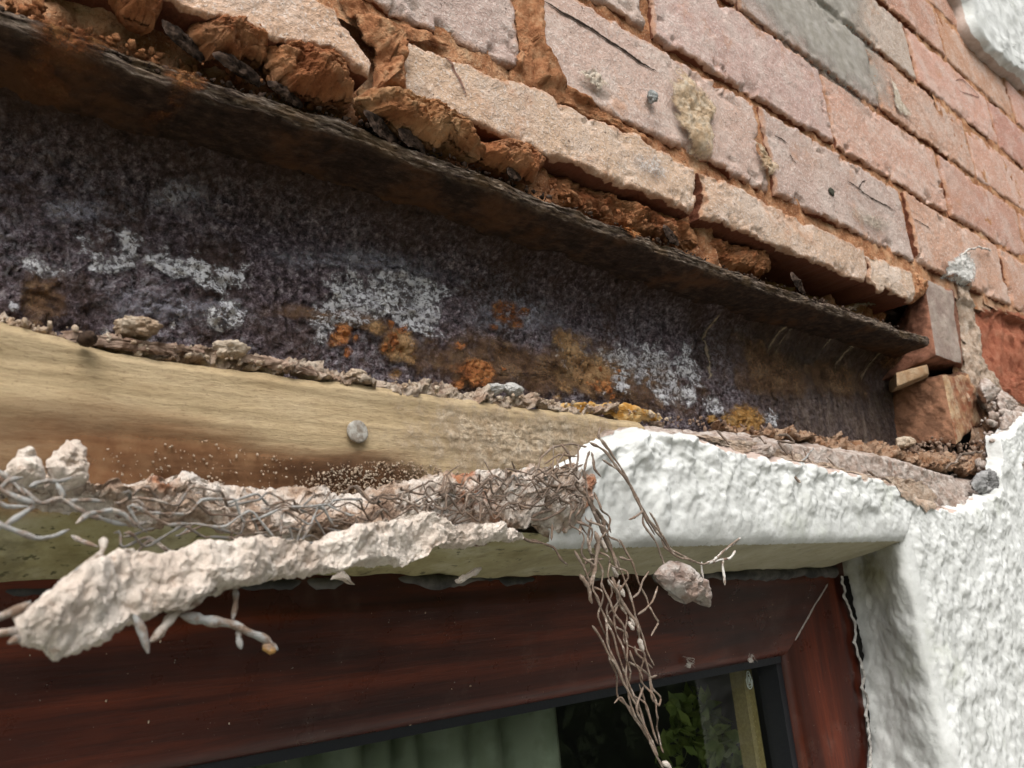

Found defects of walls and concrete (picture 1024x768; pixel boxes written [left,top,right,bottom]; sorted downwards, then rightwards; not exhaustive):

corrosion [158,19,303,116]
crack [546,2,656,71]
corrosion [363,109,425,154]
corrosion [22,275,64,327]
corrosion [790,272,805,296]
corrosion [283,300,680,423]
spalling [681,432,757,453]
corrosion [707,405,765,431]
flaking render [0,462,597,542]
spalling [772,449,943,513]
crack [841,576,872,768]